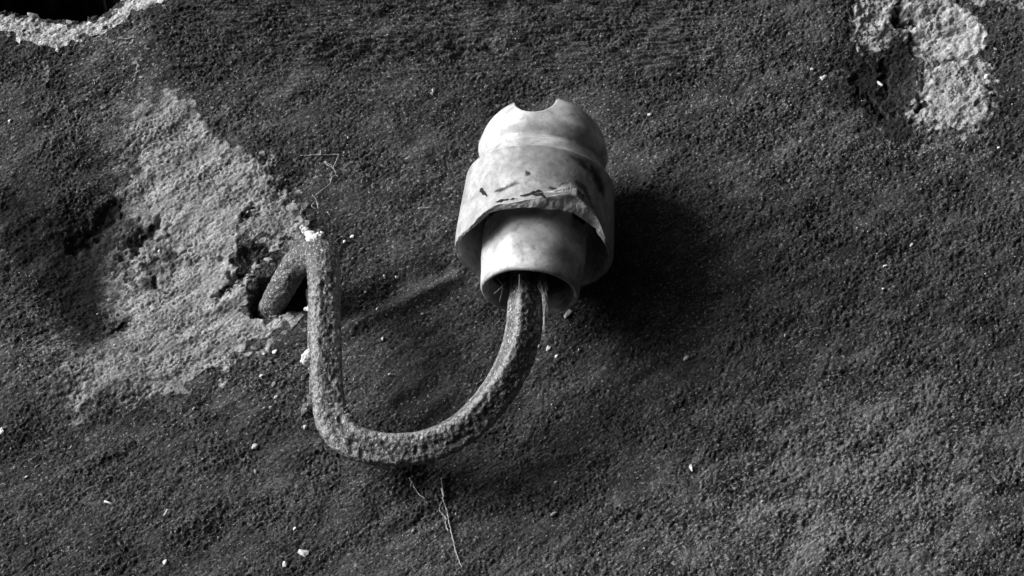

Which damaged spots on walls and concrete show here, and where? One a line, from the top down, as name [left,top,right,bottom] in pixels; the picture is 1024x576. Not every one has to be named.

spalling [0,0,164,53]
spalling [845,0,1024,141]
spalling [52,87,320,427]